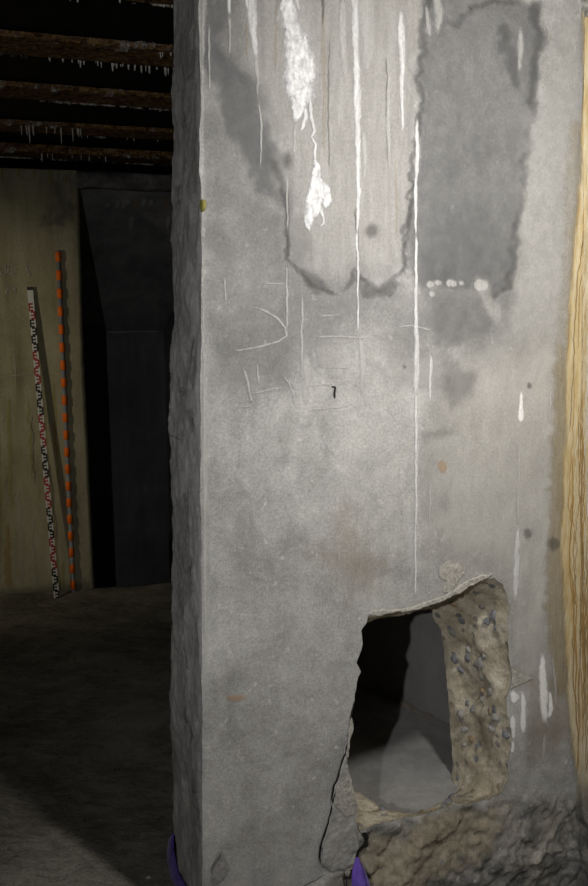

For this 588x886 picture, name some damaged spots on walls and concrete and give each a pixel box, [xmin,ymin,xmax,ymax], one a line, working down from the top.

water stain [202,0,544,595]
water stain [433,122,578,721]
crack [304,702,369,886]
spalling [322,560,534,886]
water stain [510,691,526,753]